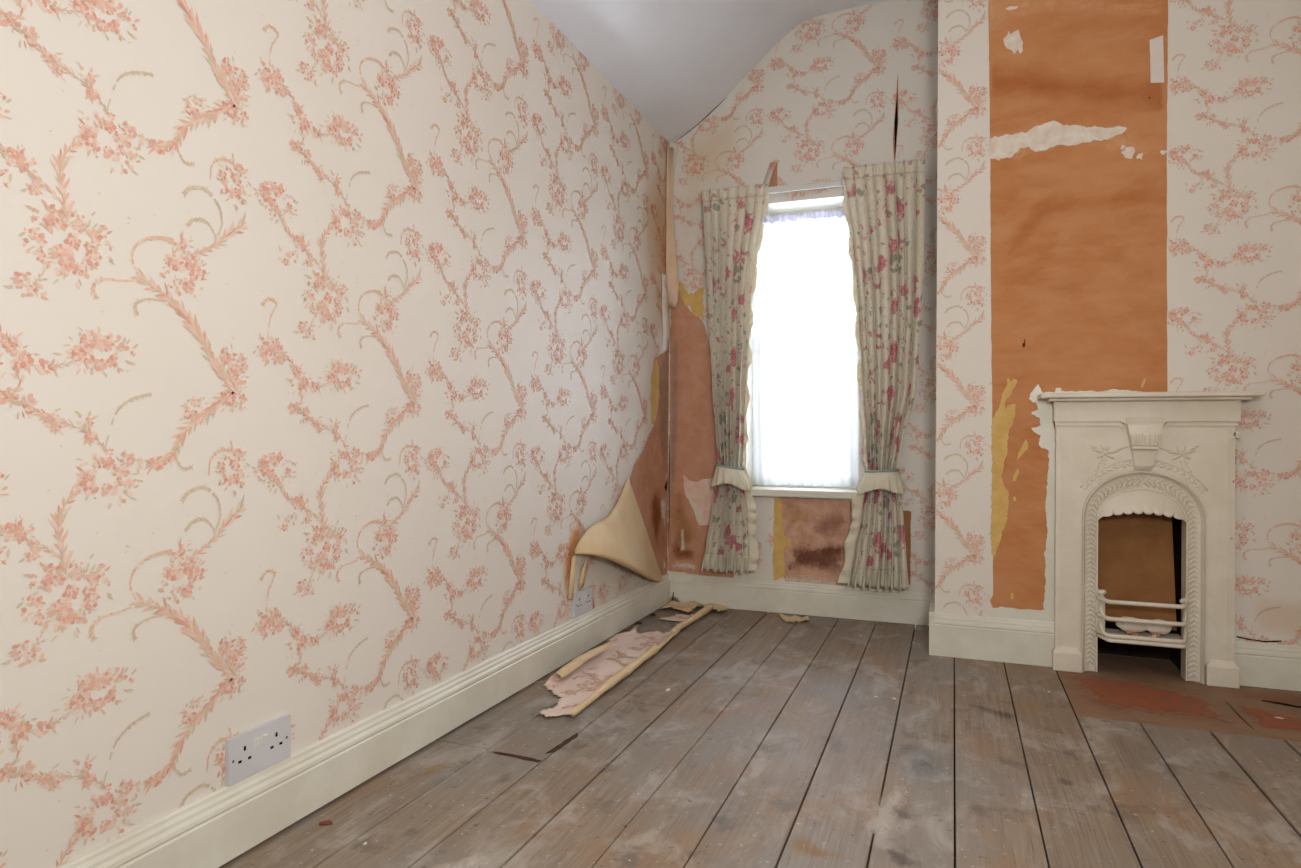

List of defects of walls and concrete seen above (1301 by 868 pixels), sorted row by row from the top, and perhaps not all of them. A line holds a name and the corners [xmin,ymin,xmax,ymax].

flaking render [568,145,734,600]
flaking render [778,497,866,587]
flaking render [988,0,1168,610]